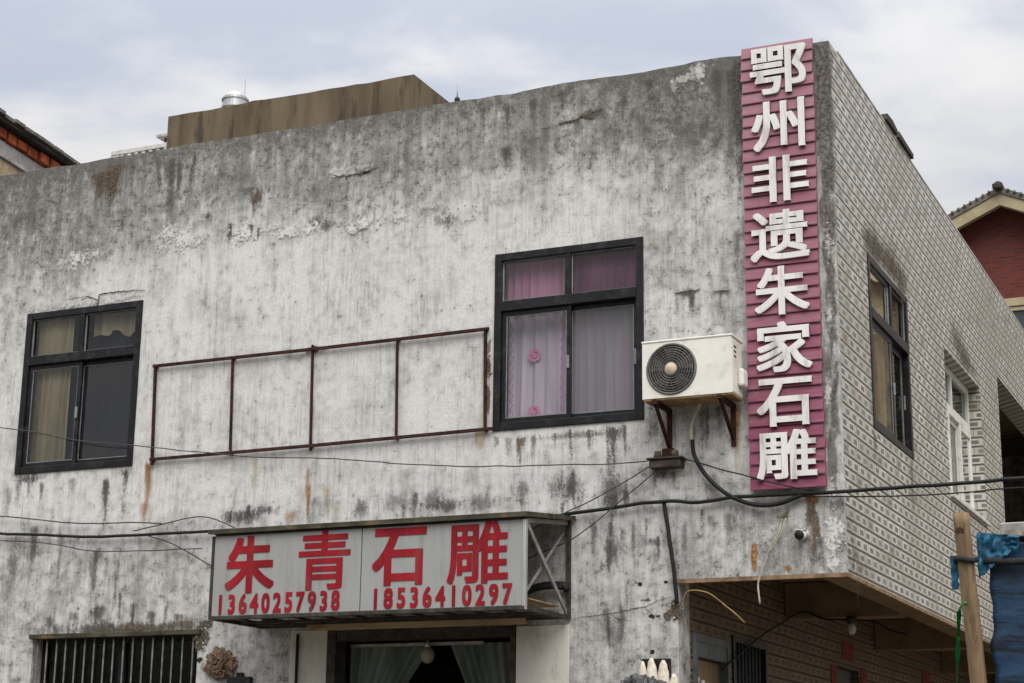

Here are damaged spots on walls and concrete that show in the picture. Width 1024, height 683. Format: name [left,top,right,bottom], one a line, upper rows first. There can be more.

peeling [670,62,707,90]
water stain [91,163,134,205]
peeling [329,165,367,177]
peeling [156,223,208,254]
peeling [228,219,321,246]
crack [67,290,145,306]
water stain [554,425,660,569]
water stain [225,505,277,526]
water stain [603,604,624,644]